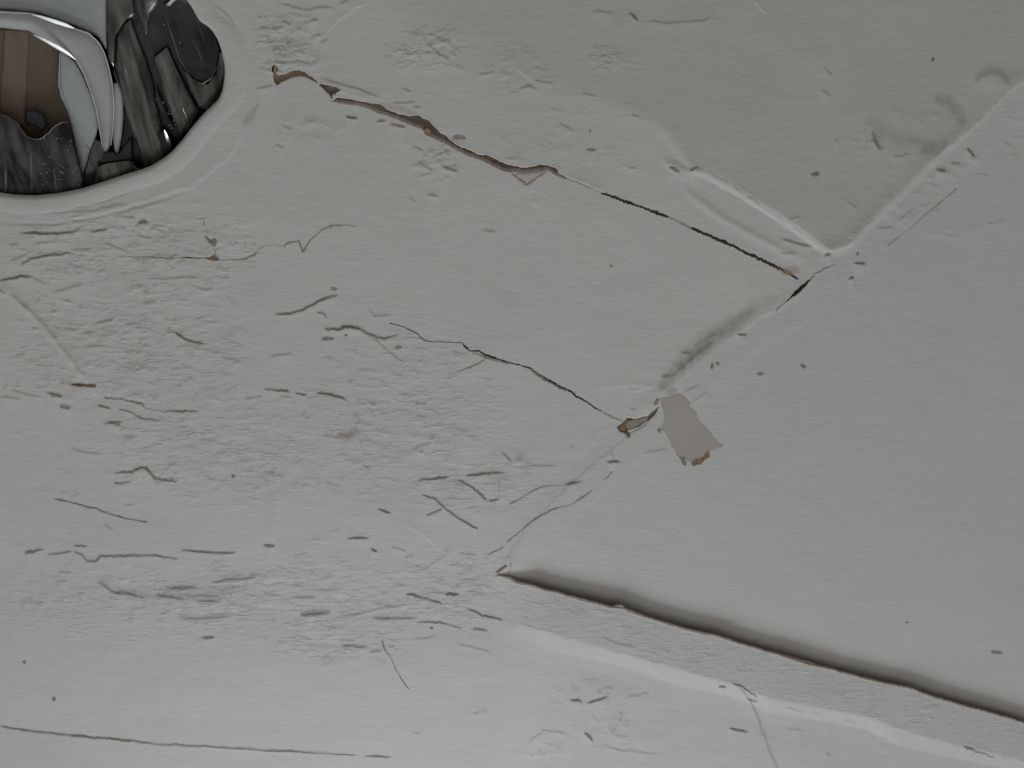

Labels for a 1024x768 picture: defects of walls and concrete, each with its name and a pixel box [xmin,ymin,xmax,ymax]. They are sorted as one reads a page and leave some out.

crack [272,66,829,311]
crack [133,223,258,261]
crack [266,296,622,421]
peeling [615,388,723,466]
crack [4,726,390,758]